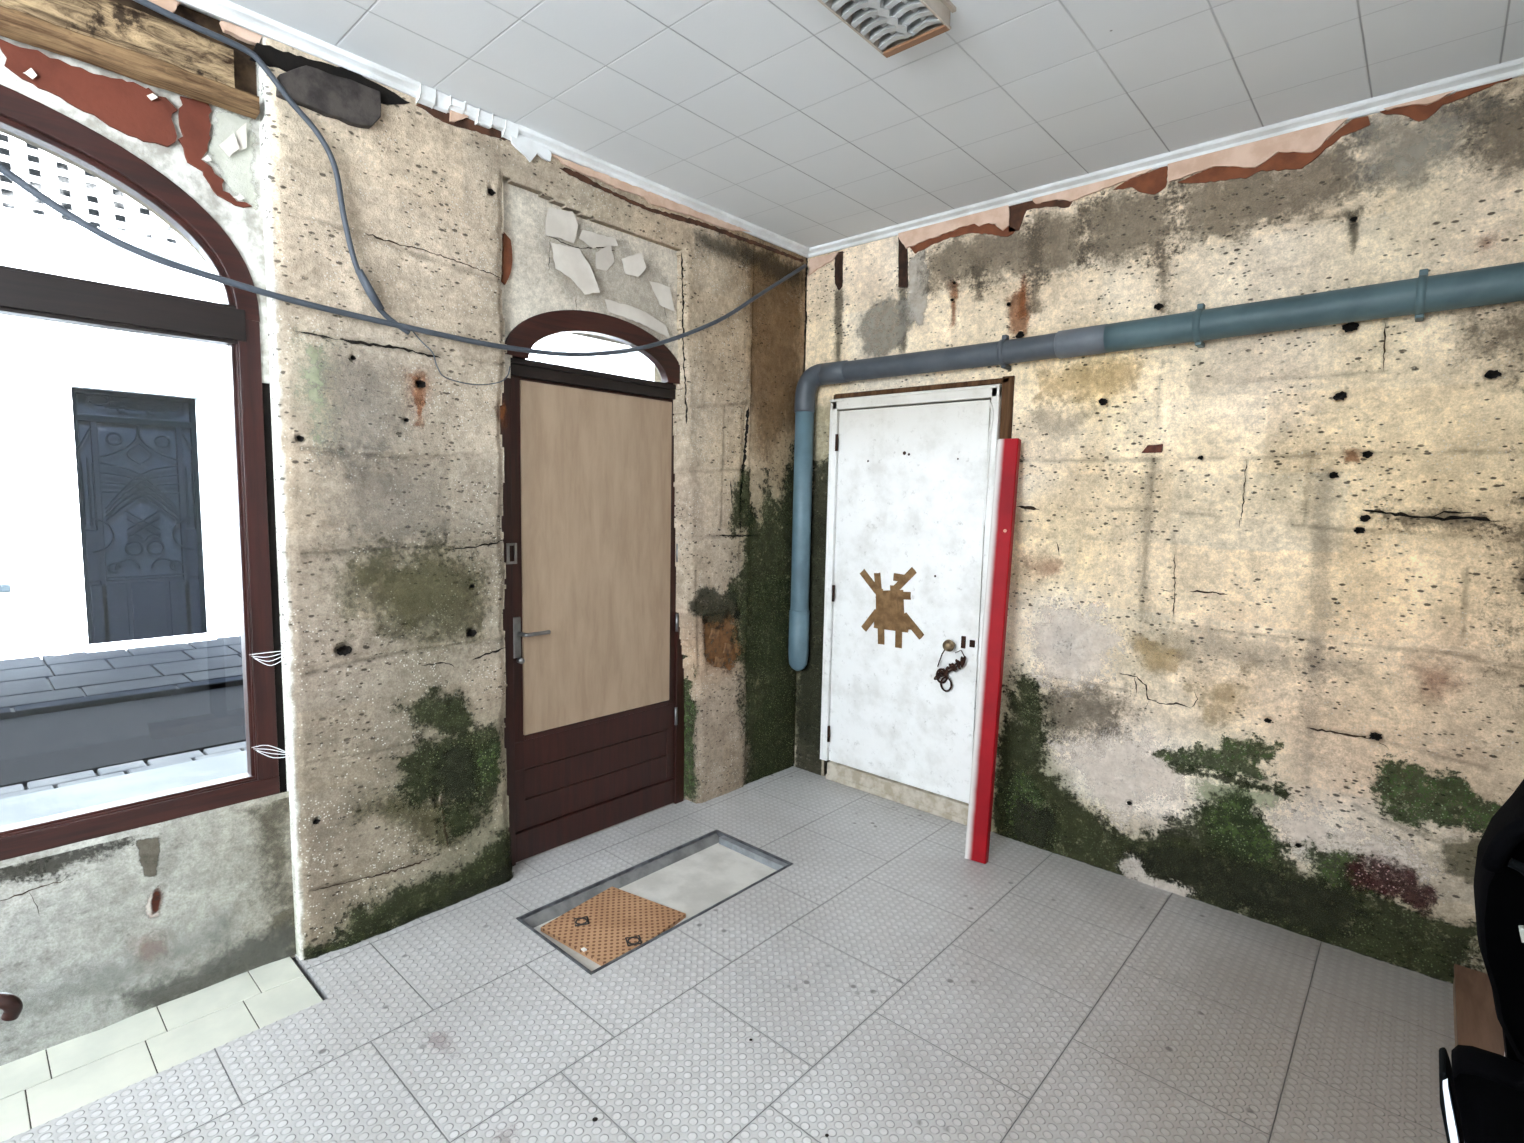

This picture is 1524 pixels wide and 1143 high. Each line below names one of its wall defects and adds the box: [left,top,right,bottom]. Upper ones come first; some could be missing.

flaking render [148,0,181,13]
peeling [0,39,258,209]
flaking render [219,20,839,276]
peeling [545,208,675,338]
flaking render [898,78,1513,254]
damp [899,83,1524,313]
damp [1465,305,1524,390]
crack [1363,510,1496,522]
damp [1047,727,1450,918]